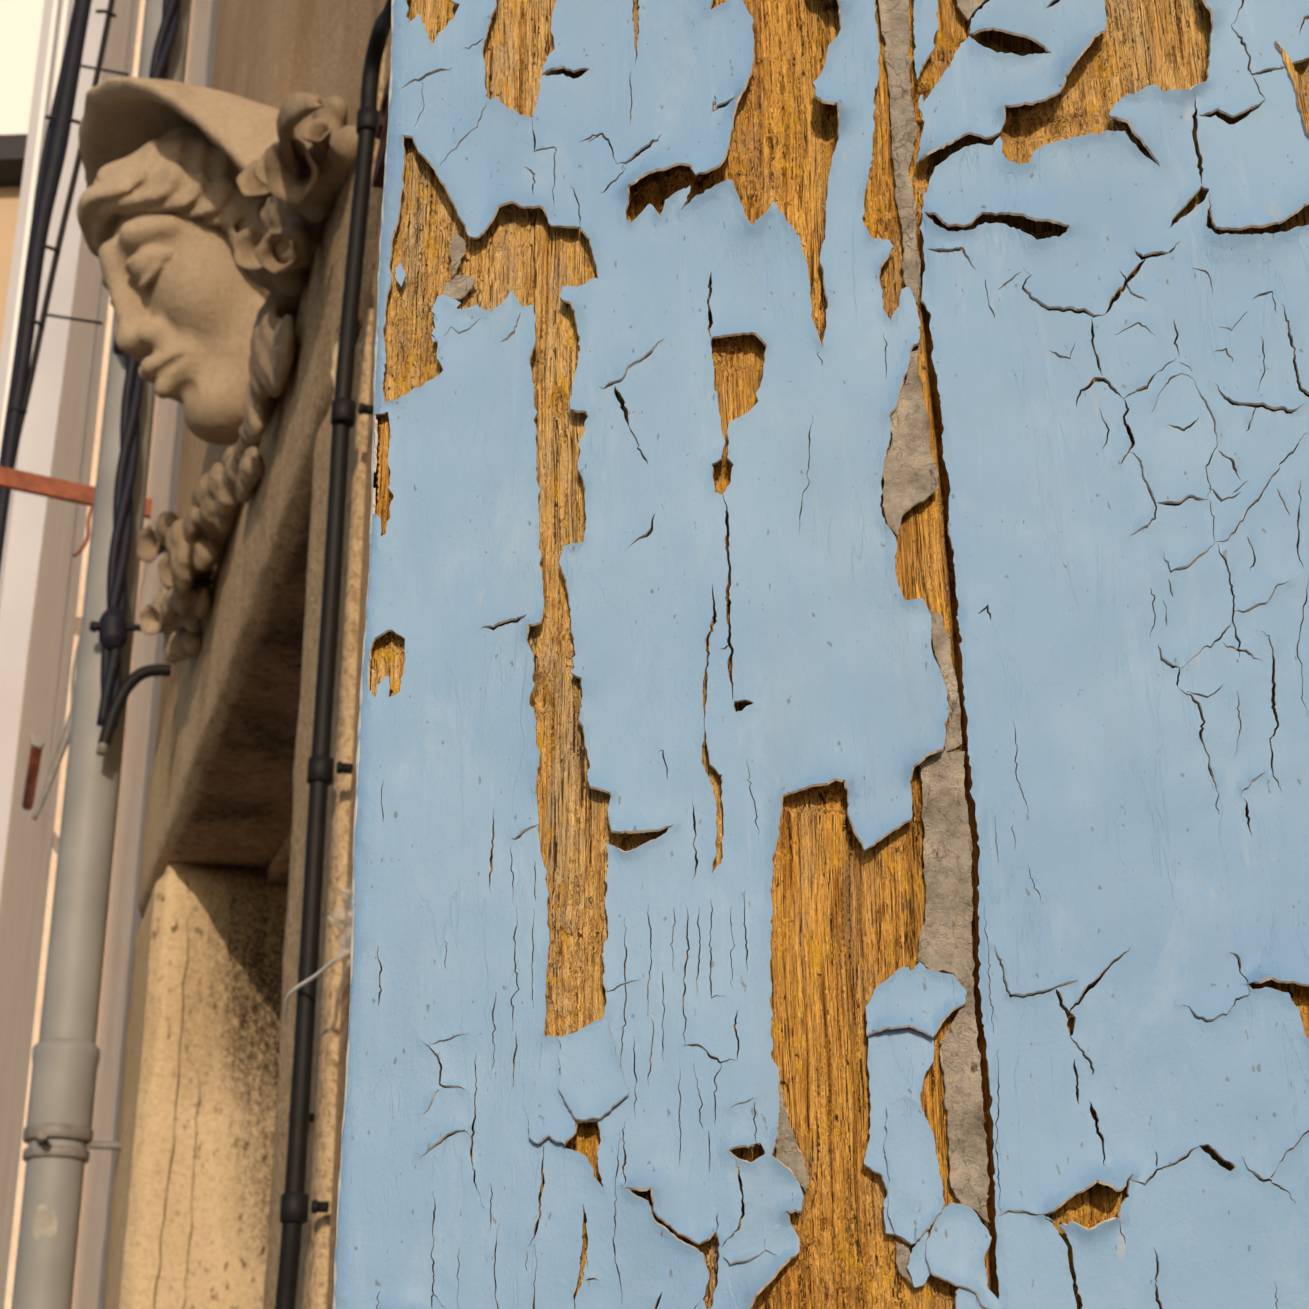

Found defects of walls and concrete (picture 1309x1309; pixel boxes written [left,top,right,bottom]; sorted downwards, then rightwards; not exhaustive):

peeling [1274,41,1309,139]
crack [706,279,714,337]
peeling [1169,162,1309,273]
crack [703,510,736,727]
peeling [370,0,1234,1309]
crack [1022,241,1307,831]
crack [489,819,536,900]
crack [691,807,699,873]
crack [417,930,545,1309]
crack [613,899,761,1304]
crack [989,945,1191,1190]
peeling [1241,944,1309,1063]